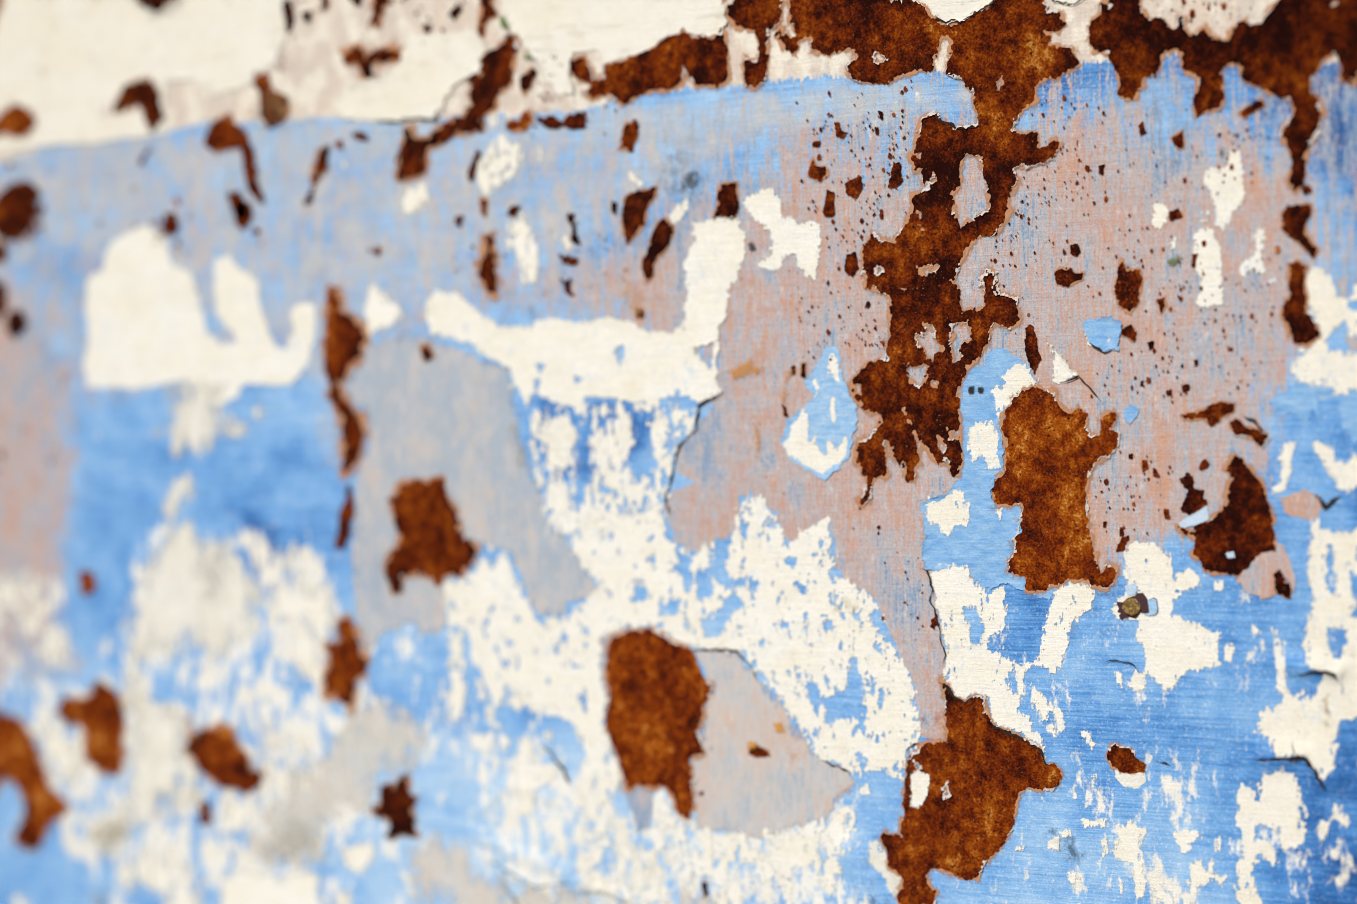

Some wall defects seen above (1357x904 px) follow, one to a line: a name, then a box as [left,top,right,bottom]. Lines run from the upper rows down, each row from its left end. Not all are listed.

corrosion [204,112,264,246]
corrosion [253,0,329,129]
corrosion [302,131,368,205]
corrosion [339,0,404,80]
peeling [626,171,643,187]
corrosion [382,0,1357,599]
corrosion [321,284,370,550]
peeling [82,225,351,904]
corrosion [604,626,714,821]
peeling [341,187,1100,904]
corrosion [879,675,1063,904]
peeling [1047,440,1357,904]